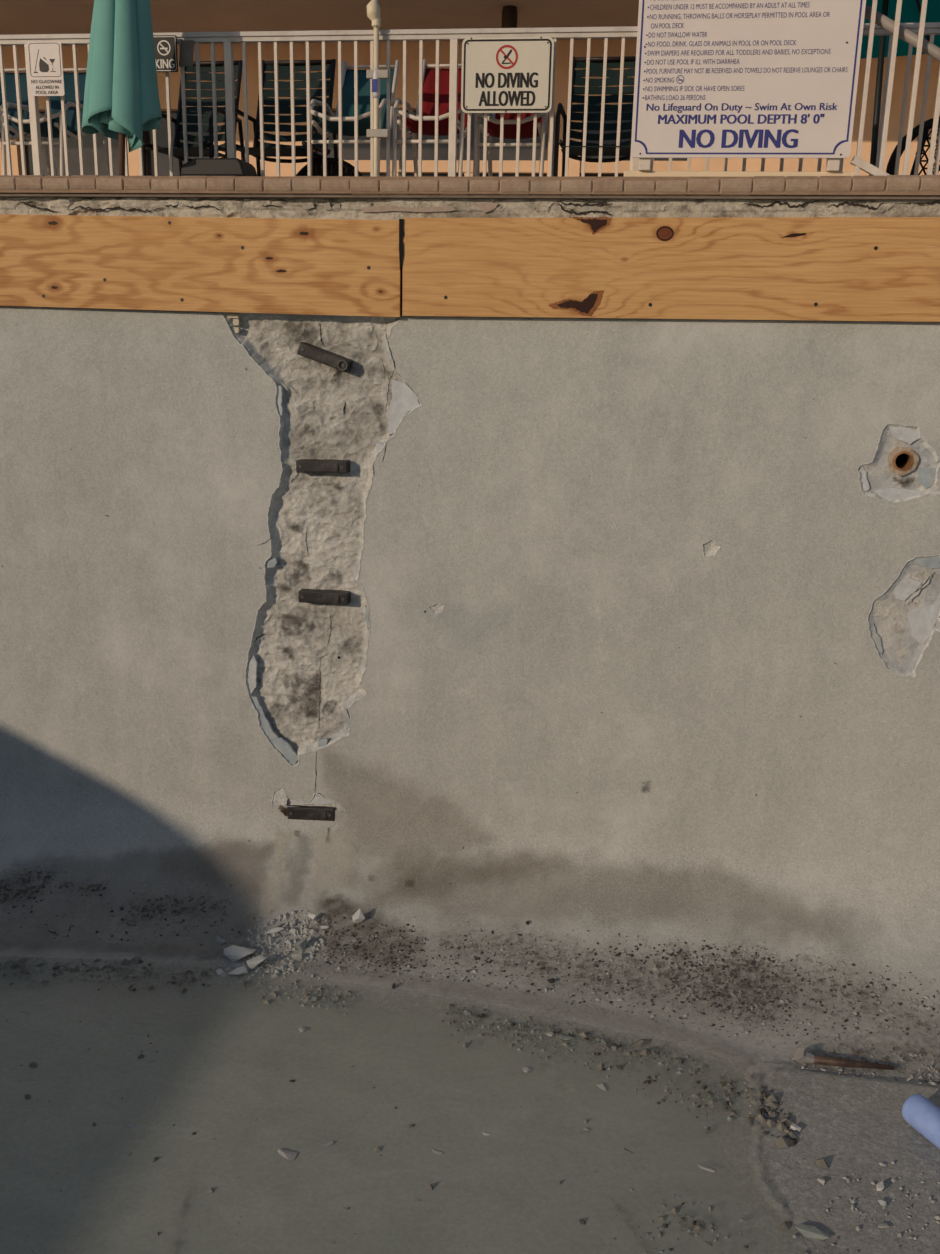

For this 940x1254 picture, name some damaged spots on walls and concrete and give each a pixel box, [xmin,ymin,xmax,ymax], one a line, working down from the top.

flaking render [857,423,940,504]
spalling [220,312,422,767]
flaking render [867,554,940,678]
flaking render [271,788,348,815]